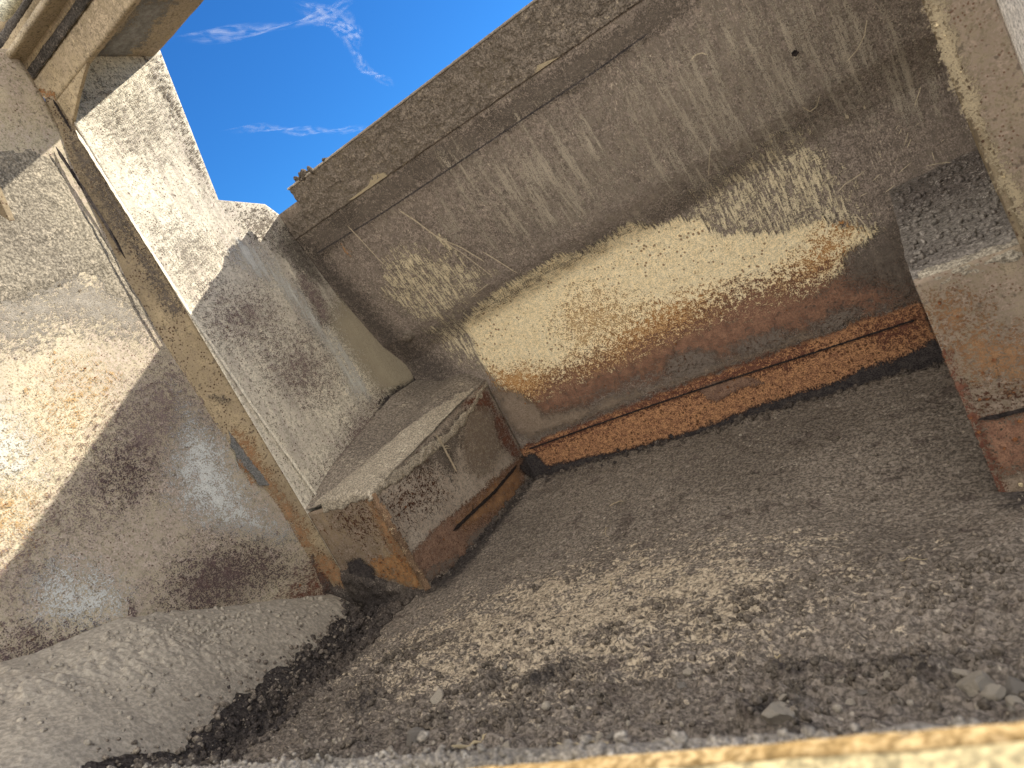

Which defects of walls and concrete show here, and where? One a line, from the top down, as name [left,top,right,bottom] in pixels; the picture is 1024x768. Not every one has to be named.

rust [0,346,343,662]
rust [326,220,1024,590]
crack [453,319,916,531]